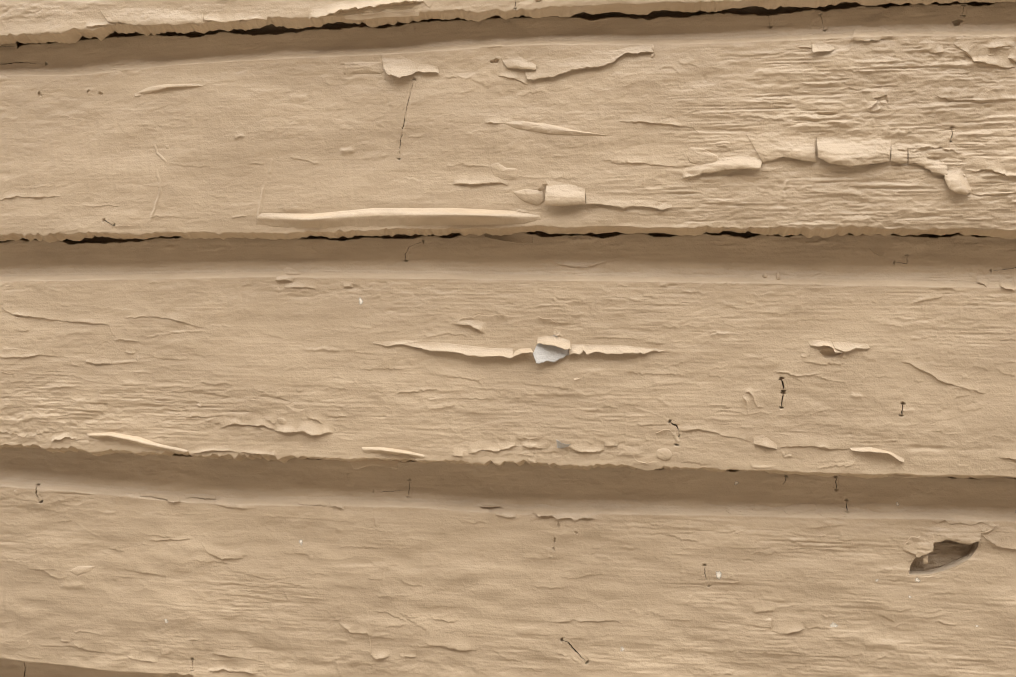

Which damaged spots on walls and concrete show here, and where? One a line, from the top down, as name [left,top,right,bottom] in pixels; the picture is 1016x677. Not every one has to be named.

peeling [343,54,439,78]
peeling [685,134,972,195]
peeling [514,181,672,210]
peeling [372,335,678,364]
peeling [805,340,870,362]
peeling [275,390,334,446]
peeling [0,426,276,455]
peeling [900,513,1016,576]